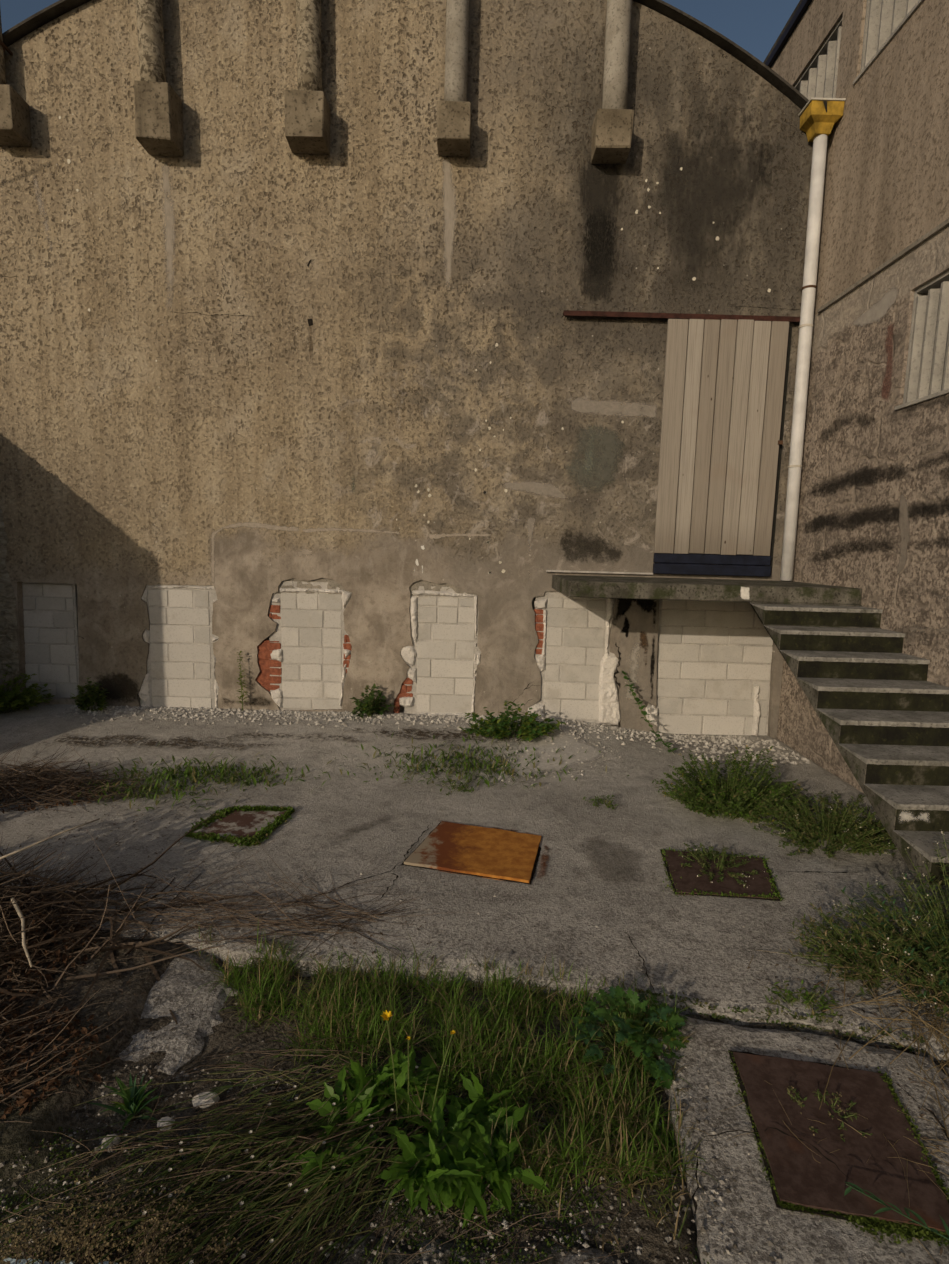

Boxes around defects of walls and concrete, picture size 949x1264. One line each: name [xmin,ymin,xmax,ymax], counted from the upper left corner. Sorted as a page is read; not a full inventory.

damp [580,160,623,299]
damp [813,469,877,493]
damp [805,505,949,532]
flaking render [268,578,348,619]
flaking render [409,580,464,596]
flaking render [256,640,282,692]
flaking render [343,635,352,673]
flaking render [393,677,413,713]